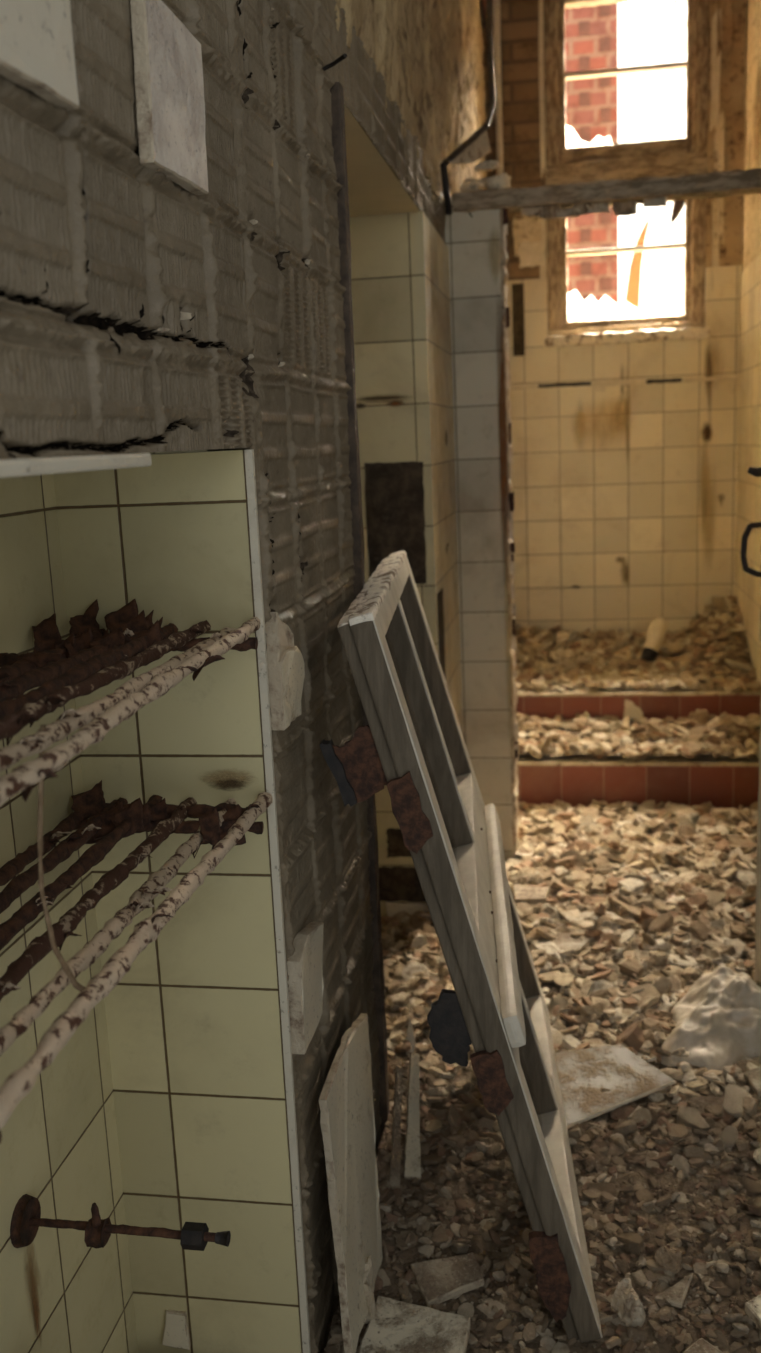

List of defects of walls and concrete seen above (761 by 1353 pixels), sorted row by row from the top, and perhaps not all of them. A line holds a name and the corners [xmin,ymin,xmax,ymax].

crack [0,259,229,355]
crack [0,419,192,479]